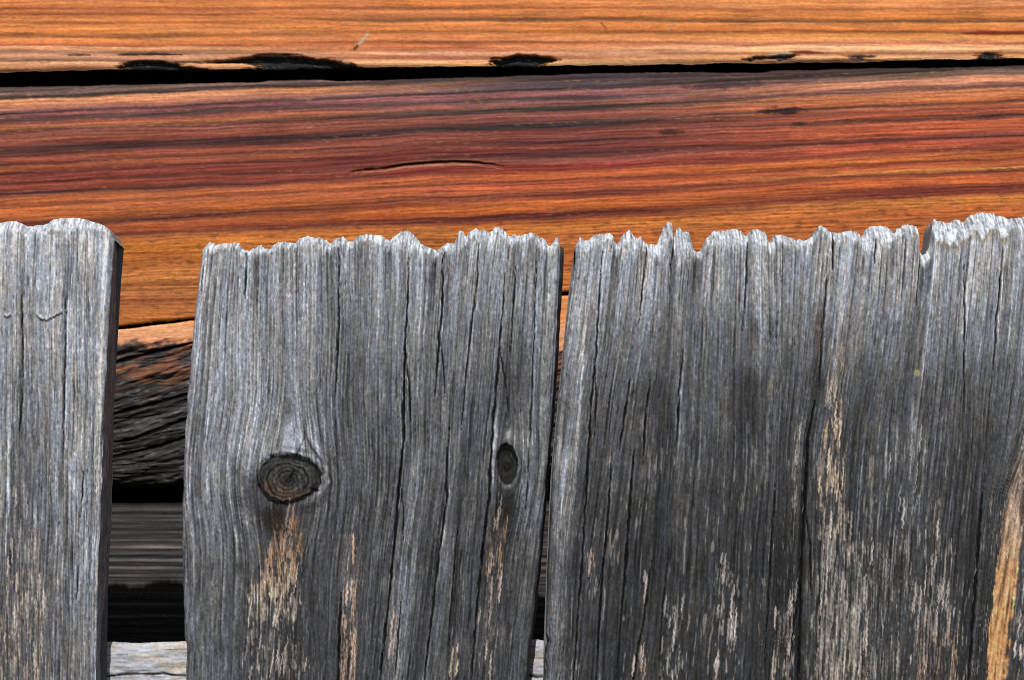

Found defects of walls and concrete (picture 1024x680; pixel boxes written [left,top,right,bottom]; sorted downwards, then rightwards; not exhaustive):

crack [352,161,503,173]
crack [380,268,411,679]
crack [424,245,537,680]
crack [764,232,834,679]